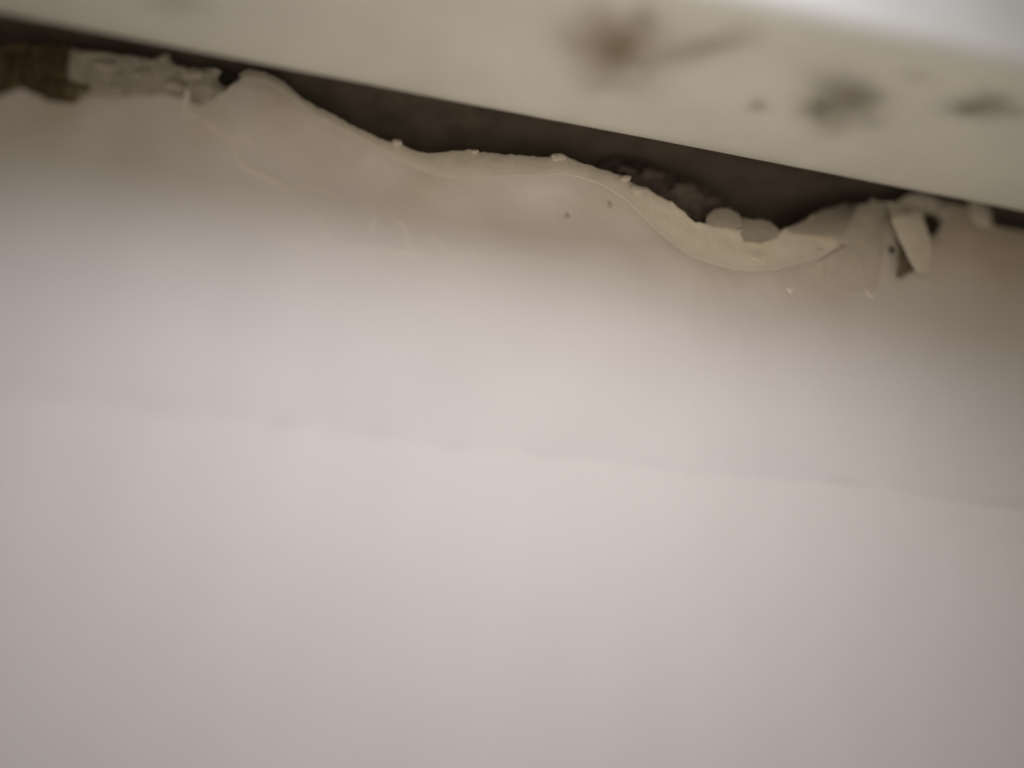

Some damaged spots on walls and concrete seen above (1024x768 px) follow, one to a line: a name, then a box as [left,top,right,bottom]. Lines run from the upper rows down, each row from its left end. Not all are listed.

flaking render [60,46,845,272]
peeling [887,191,992,278]